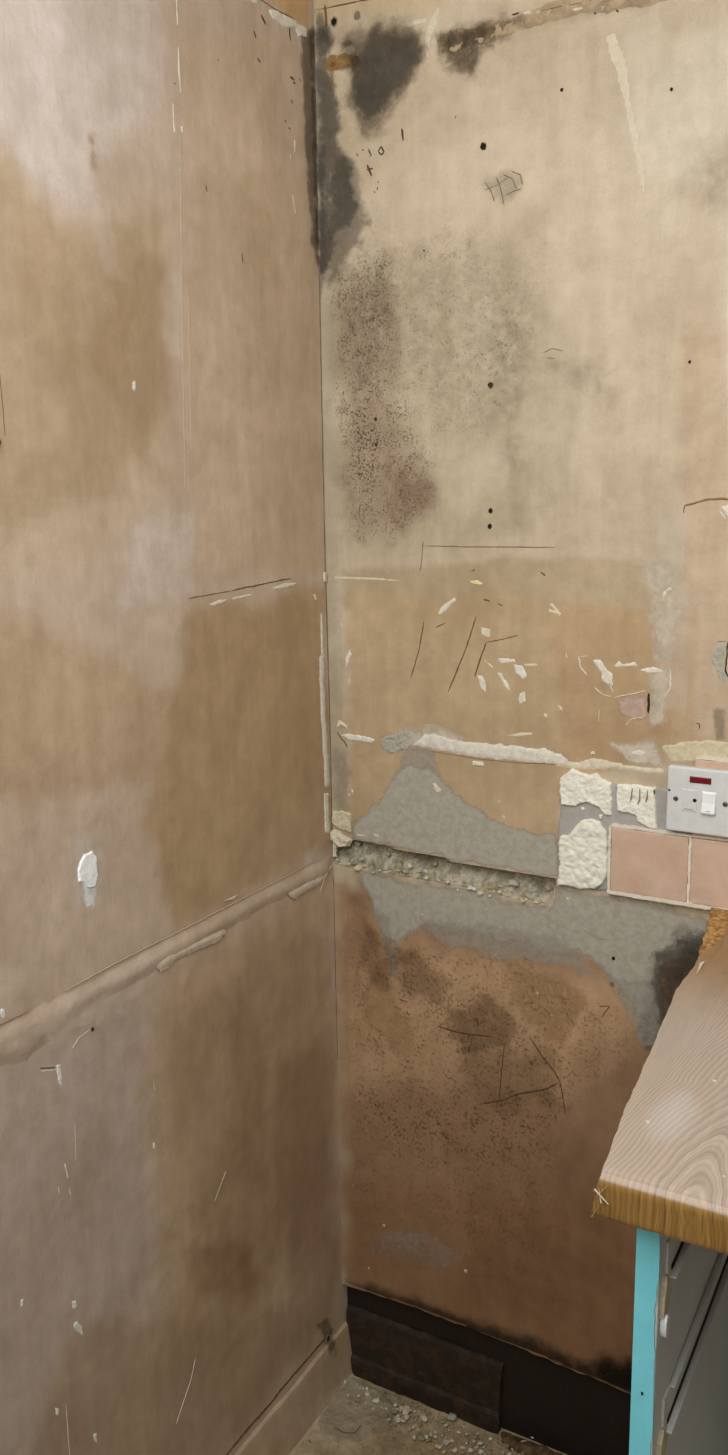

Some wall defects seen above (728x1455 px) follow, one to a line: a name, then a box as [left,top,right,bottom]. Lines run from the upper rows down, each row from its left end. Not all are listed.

flaking render [400,0,667,58]
damp [285,29,418,271]
peeling [683,497,728,519]
peeling [437,598,456,627]
peeling [566,654,671,725]
flaking render [712,641,728,682]
flaking render [319,614,558,910]
damp [640,937,703,1046]
damp [364,1287,632,1393]